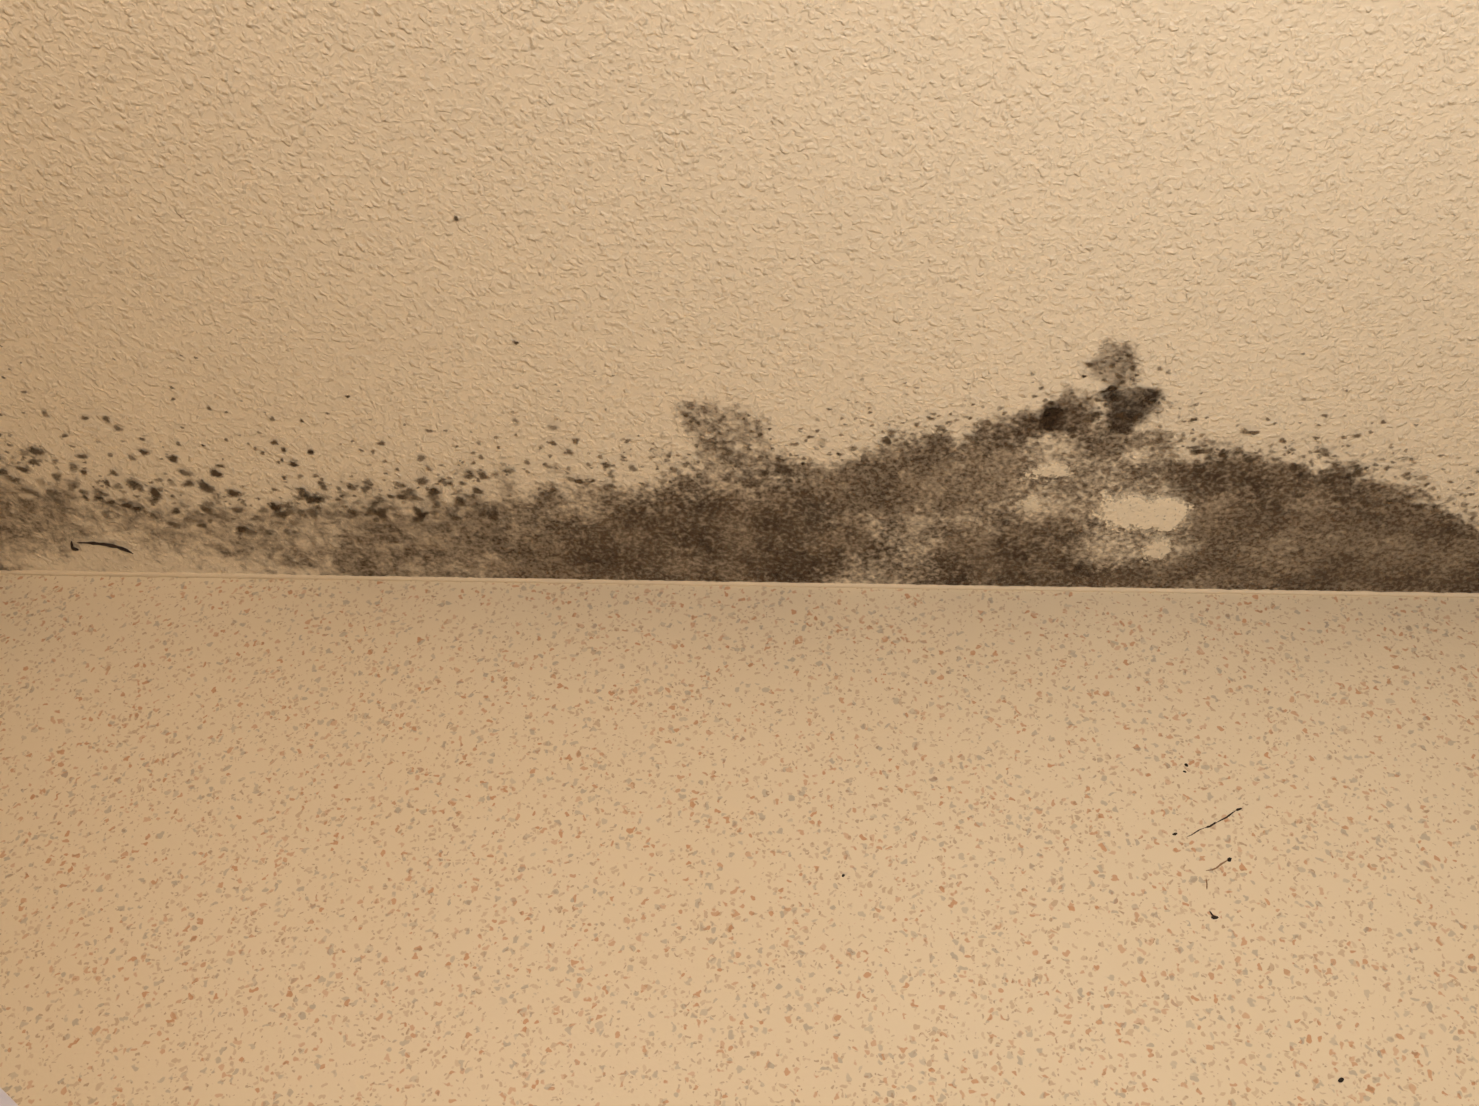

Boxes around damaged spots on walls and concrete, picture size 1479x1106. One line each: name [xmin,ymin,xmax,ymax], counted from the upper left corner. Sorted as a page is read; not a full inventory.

water stain [0,344,1479,593]